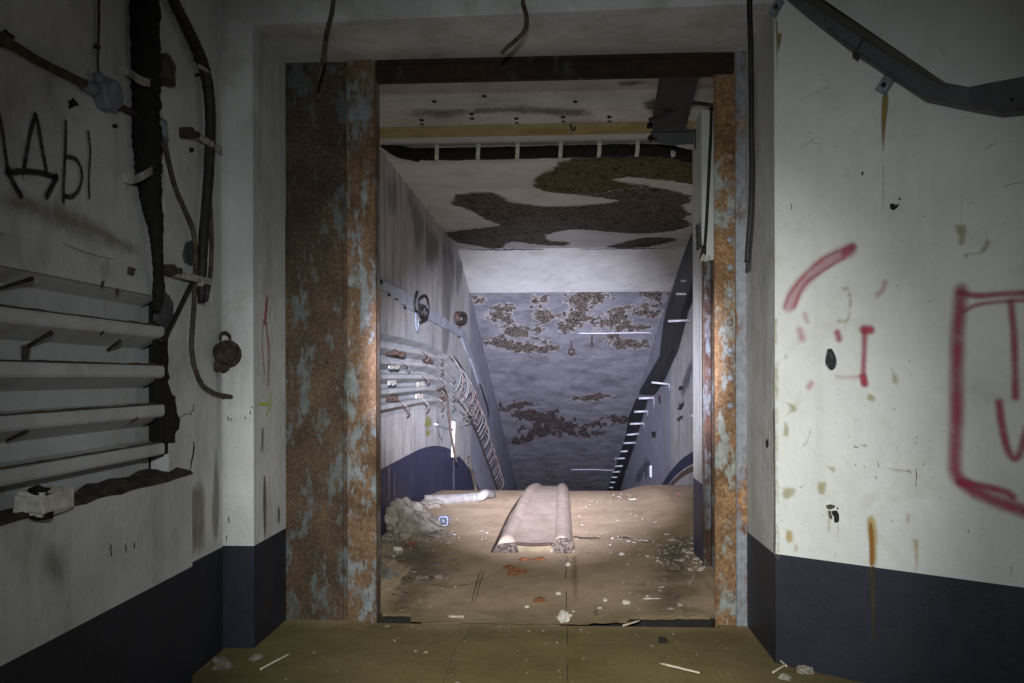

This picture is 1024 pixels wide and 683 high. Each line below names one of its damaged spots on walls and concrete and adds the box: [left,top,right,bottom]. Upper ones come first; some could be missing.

peeling [445,157,702,250]
peeling [471,291,670,354]
peeling [497,400,630,446]
peeling [570,393,616,402]
rust [868,517,876,633]